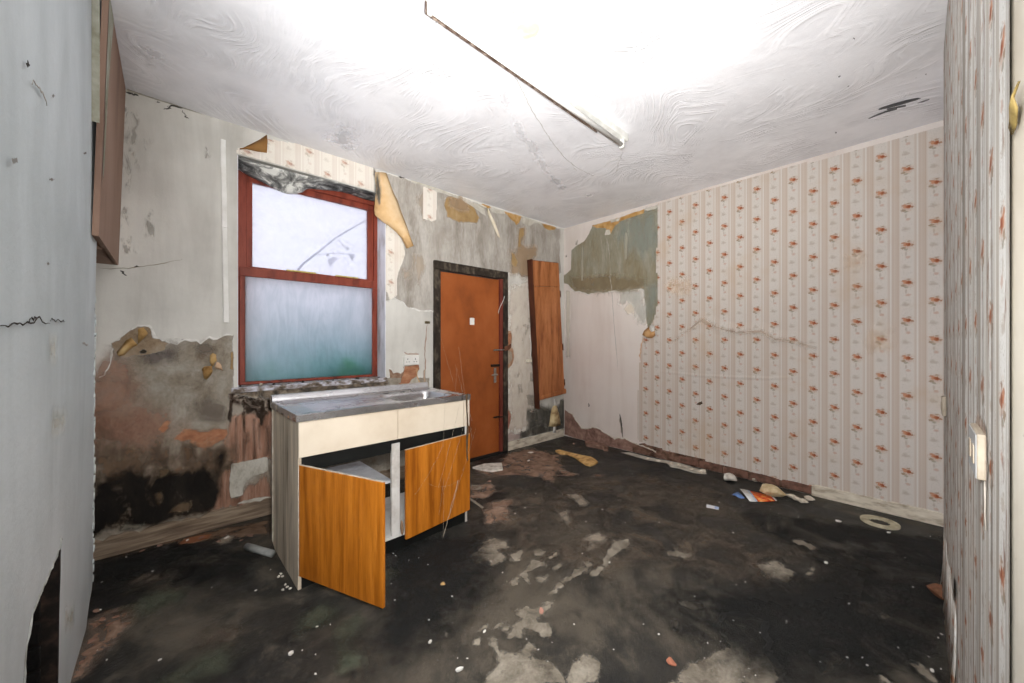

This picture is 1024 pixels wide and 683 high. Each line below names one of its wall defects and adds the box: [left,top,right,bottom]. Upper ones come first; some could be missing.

peeling [240,135,268,153]
crack [0,316,65,327]
flaking render [374,172,658,358]
damp [93,325,429,541]
flaking render [564,410,815,503]
spalling [23,537,62,683]